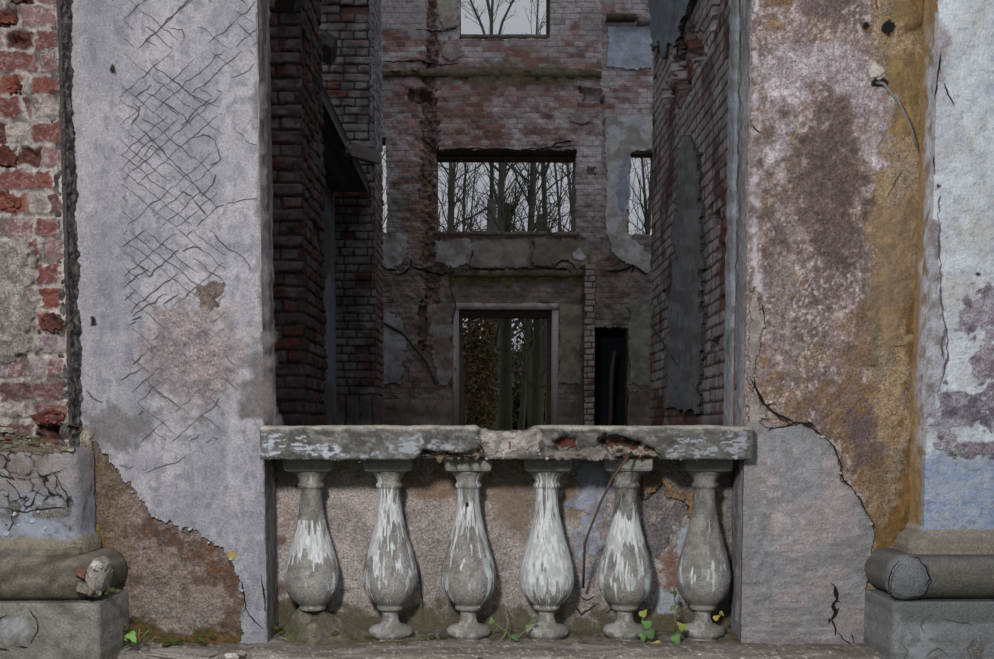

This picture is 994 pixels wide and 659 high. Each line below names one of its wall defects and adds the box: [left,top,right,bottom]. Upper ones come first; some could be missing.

flaking render [606,0,693,71]
spalling [4,74,23,94]
spalling [0,190,22,211]
crack [119,0,257,473]
flaking render [434,237,589,270]
flaking render [604,112,653,273]
flaking render [725,0,742,353]
spalling [37,312,64,333]
crack [0,449,72,537]
flaking render [260,286,874,645]
spalling [75,441,261,659]
crack [828,582,854,644]